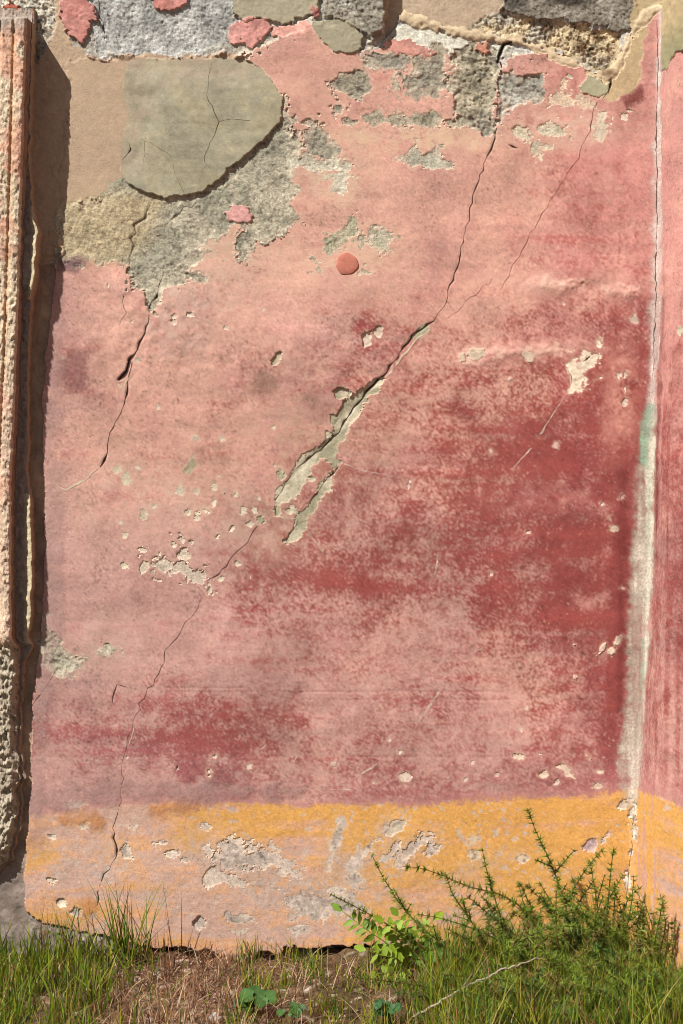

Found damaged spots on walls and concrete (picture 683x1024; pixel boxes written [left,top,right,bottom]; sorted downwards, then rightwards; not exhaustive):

spalling [55,42,633,326]
crack [56,136,196,491]
peeling [175,455,221,521]
spalling [216,378,386,545]
crack [96,42,611,906]
peeling [362,326,384,348]
peeling [566,337,603,394]
leakage [616,7,663,806]
spalling [121,533,225,596]
spalling [35,613,126,680]
peeling [152,840,190,863]
peeling [200,817,442,938]